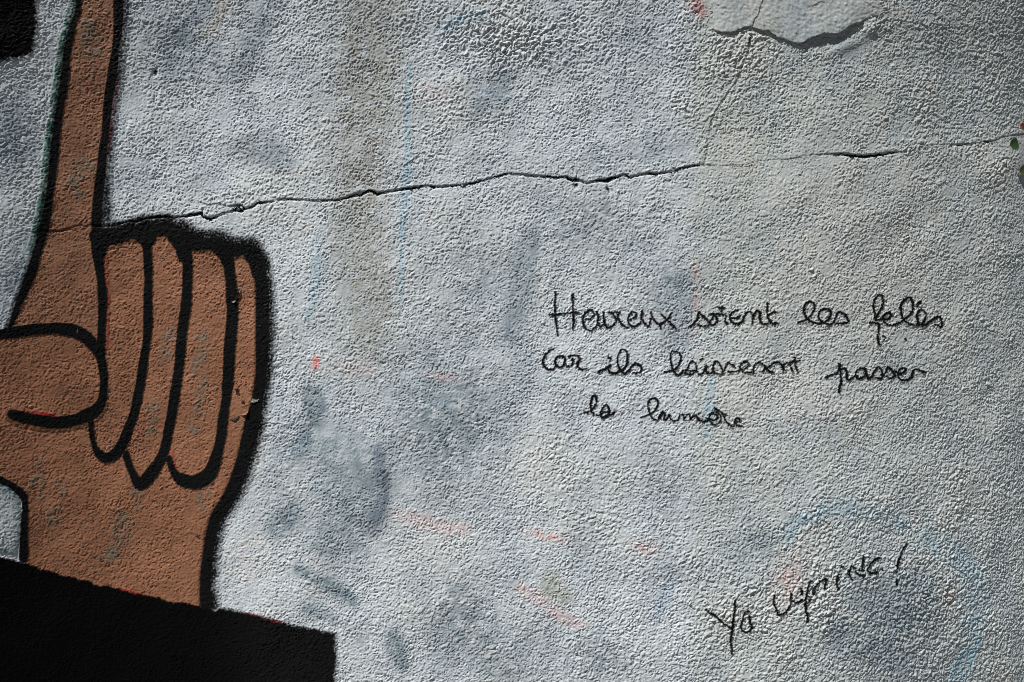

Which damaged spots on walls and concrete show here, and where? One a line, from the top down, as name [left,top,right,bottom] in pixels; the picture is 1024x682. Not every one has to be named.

flaking render [693,0,887,43]
crack [0,36,1024,241]